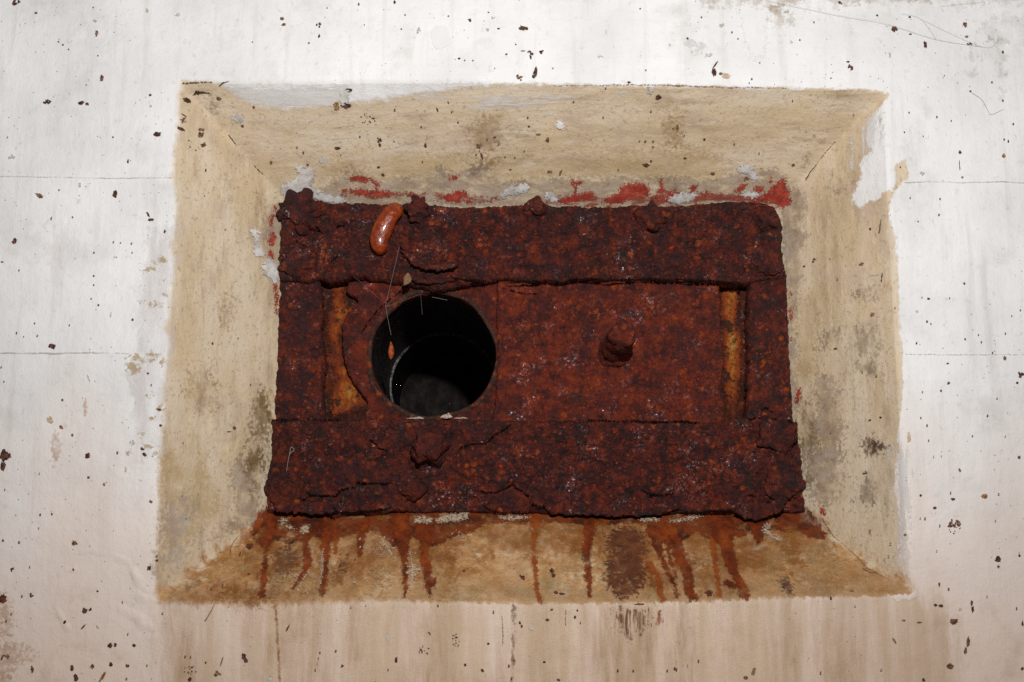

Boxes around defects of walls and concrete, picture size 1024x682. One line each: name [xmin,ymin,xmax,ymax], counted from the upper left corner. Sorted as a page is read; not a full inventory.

peeling [249,144,816,320]
mould [243,384,271,492]
corrosion [325,284,367,418]
corrosion [719,288,744,419]
peeling [790,369,802,409]
mould [861,432,890,457]
corrosion [245,506,828,640]